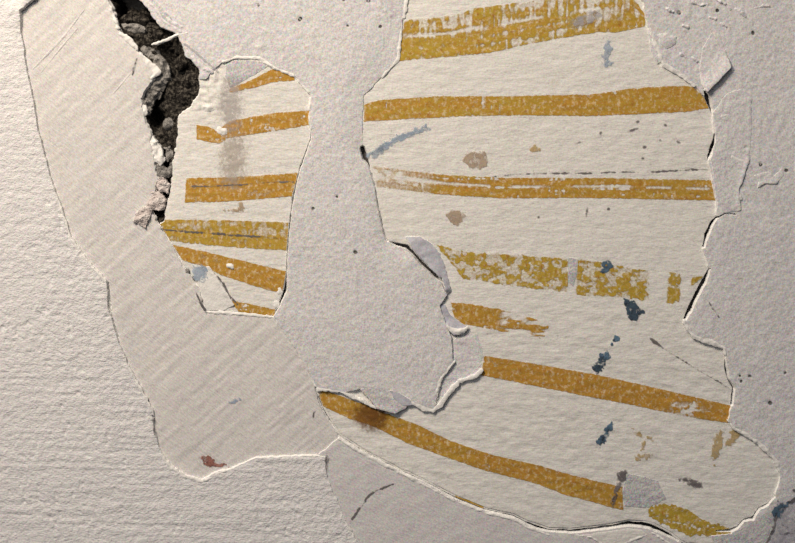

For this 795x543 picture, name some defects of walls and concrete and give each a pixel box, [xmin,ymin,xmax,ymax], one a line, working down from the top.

peeling [22,0,339,483]
peeling [316,0,781,543]